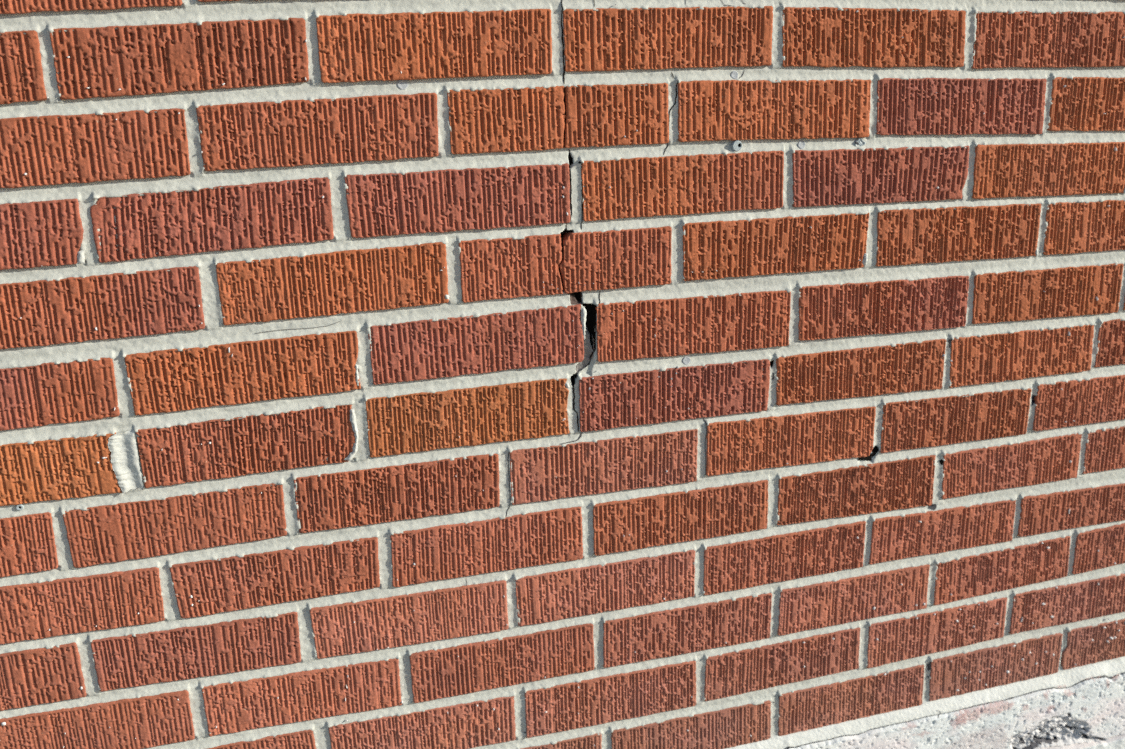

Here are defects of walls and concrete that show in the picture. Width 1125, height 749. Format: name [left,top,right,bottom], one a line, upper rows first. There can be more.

crack [558,0,600,444]
crack [504,453,512,516]
spalling [1009,713,1125,749]